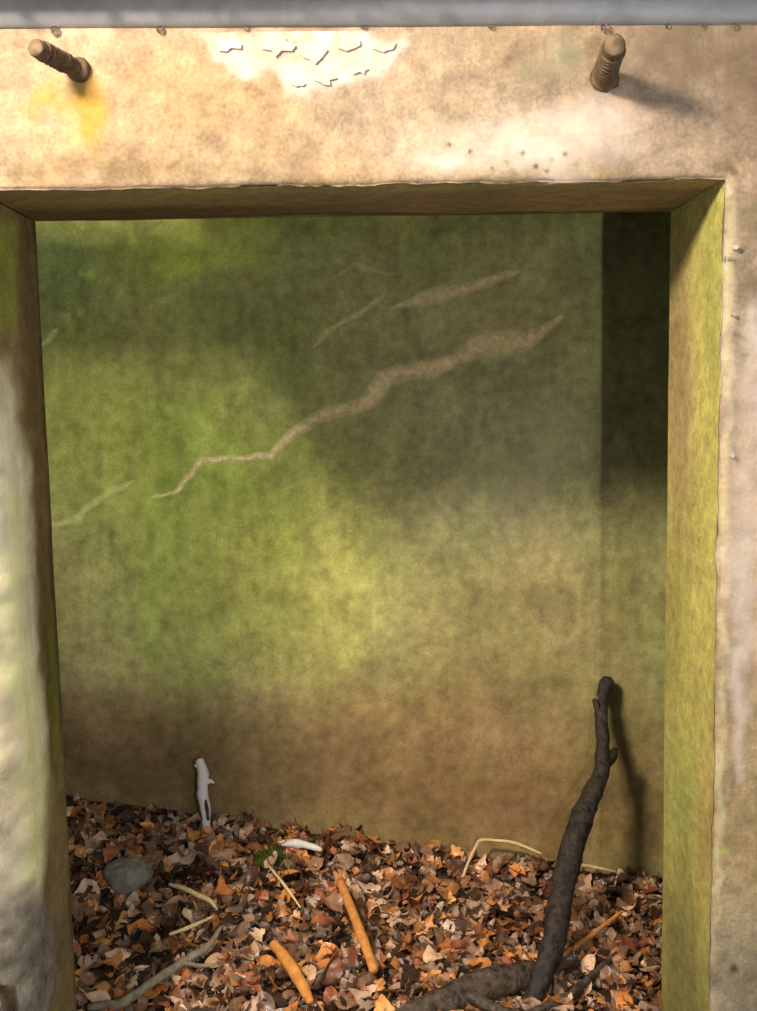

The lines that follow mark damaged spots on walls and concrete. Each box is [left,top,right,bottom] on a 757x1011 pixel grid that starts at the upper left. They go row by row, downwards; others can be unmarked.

peeling [214,30,407,96]
crack [152,316,562,498]
crack [52,483,130,526]